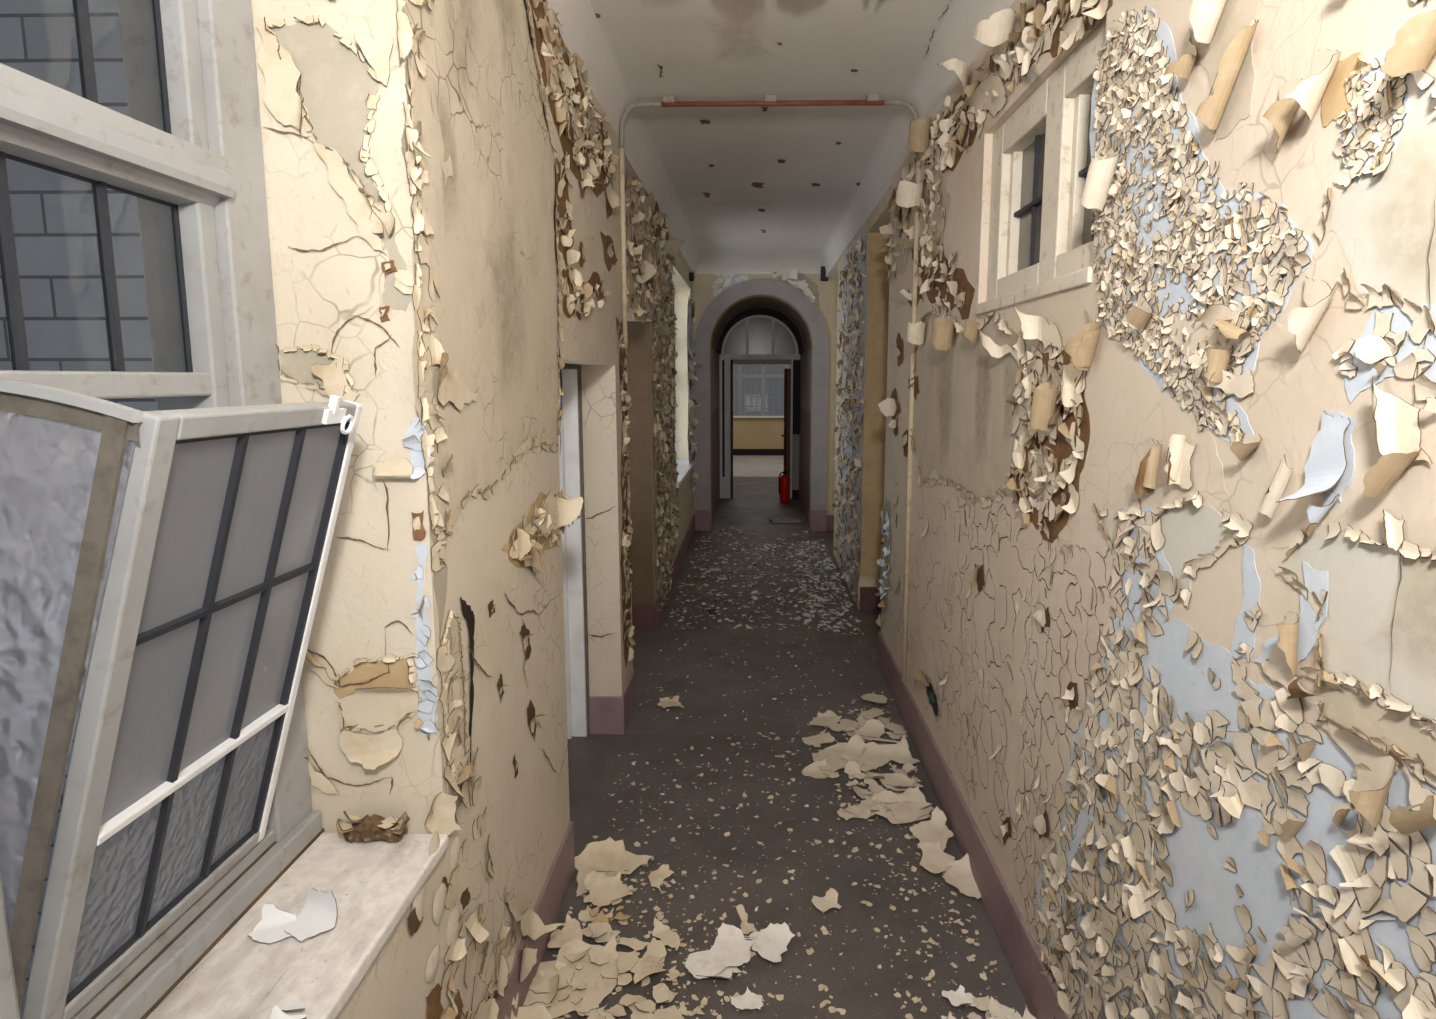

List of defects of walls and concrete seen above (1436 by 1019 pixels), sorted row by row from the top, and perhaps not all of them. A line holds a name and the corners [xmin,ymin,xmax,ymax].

crack [265,127,308,138]
crack [288,236,359,252]
crack [524,0,562,447]
crack [331,308,398,375]
peeling [248,0,1037,1019]
peeling [878,0,1436,1019]
crack [460,596,529,762]
crack [505,593,561,623]
crack [885,482,1152,960]